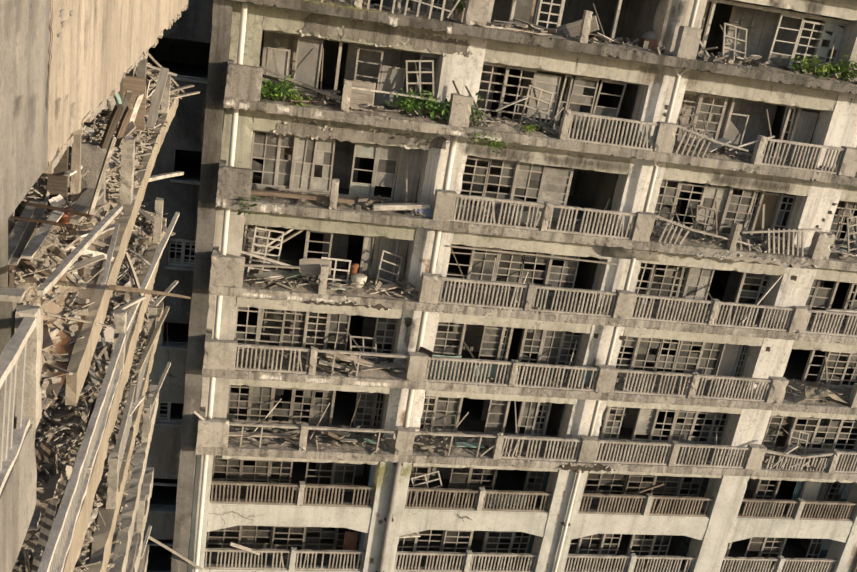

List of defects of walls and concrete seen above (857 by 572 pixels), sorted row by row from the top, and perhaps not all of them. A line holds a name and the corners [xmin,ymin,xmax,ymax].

spalling [558,462,615,474]